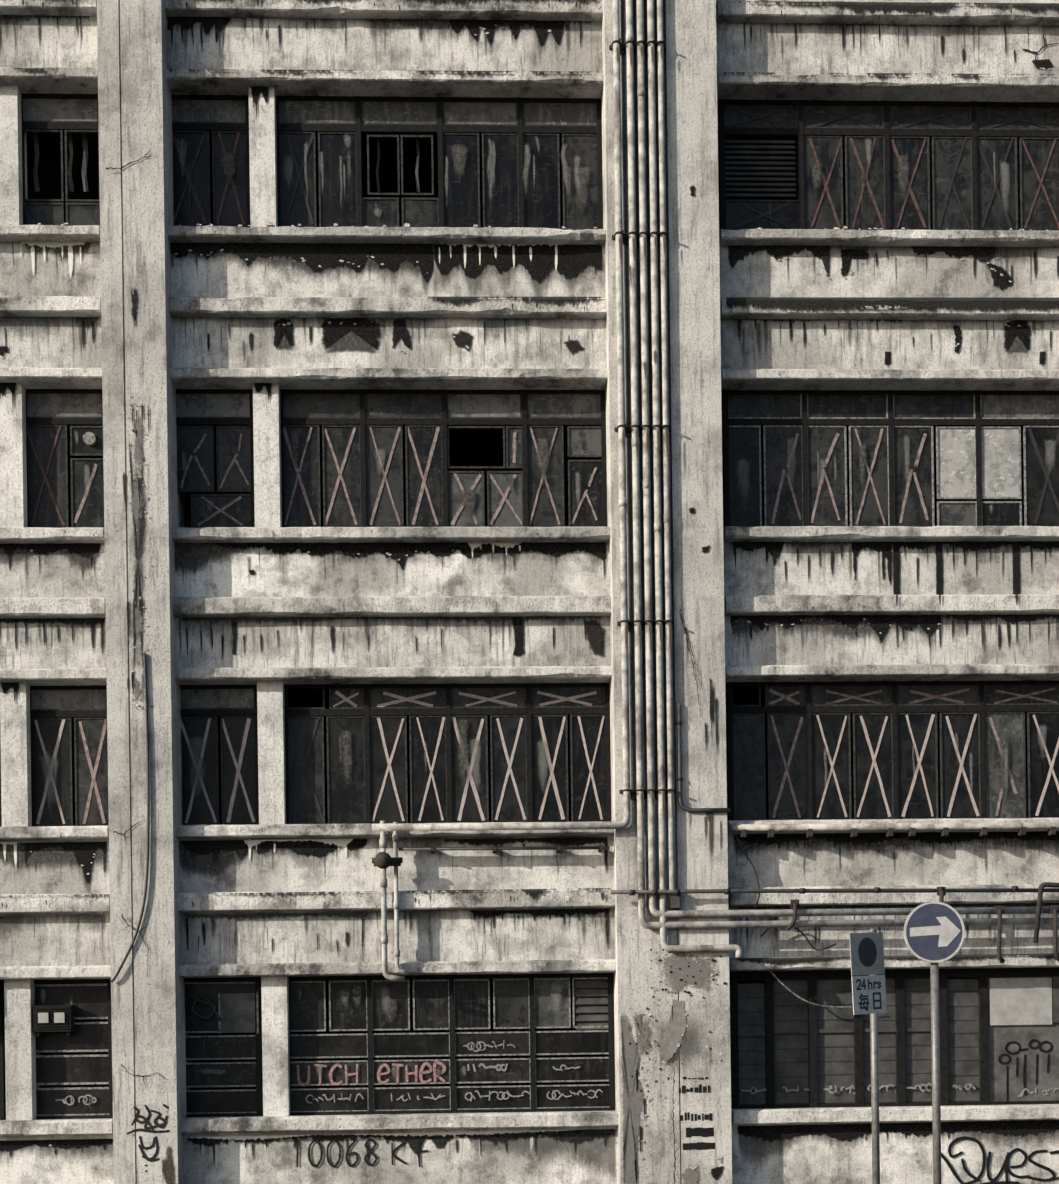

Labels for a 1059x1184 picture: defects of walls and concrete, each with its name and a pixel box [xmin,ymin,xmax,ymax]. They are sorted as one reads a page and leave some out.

water stain [734,1,1059,80]
water stain [399,244,602,343]
water stain [0,317,98,358]
spalling [273,318,294,349]
spalling [309,318,411,353]
spalling [452,323,485,352]
spalling [564,339,585,354]
water stain [726,297,1059,349]
water stain [621,0,677,825]
water stain [732,541,1059,651]
peeling [620,948,729,1184]
water stain [738,1120,1059,1161]